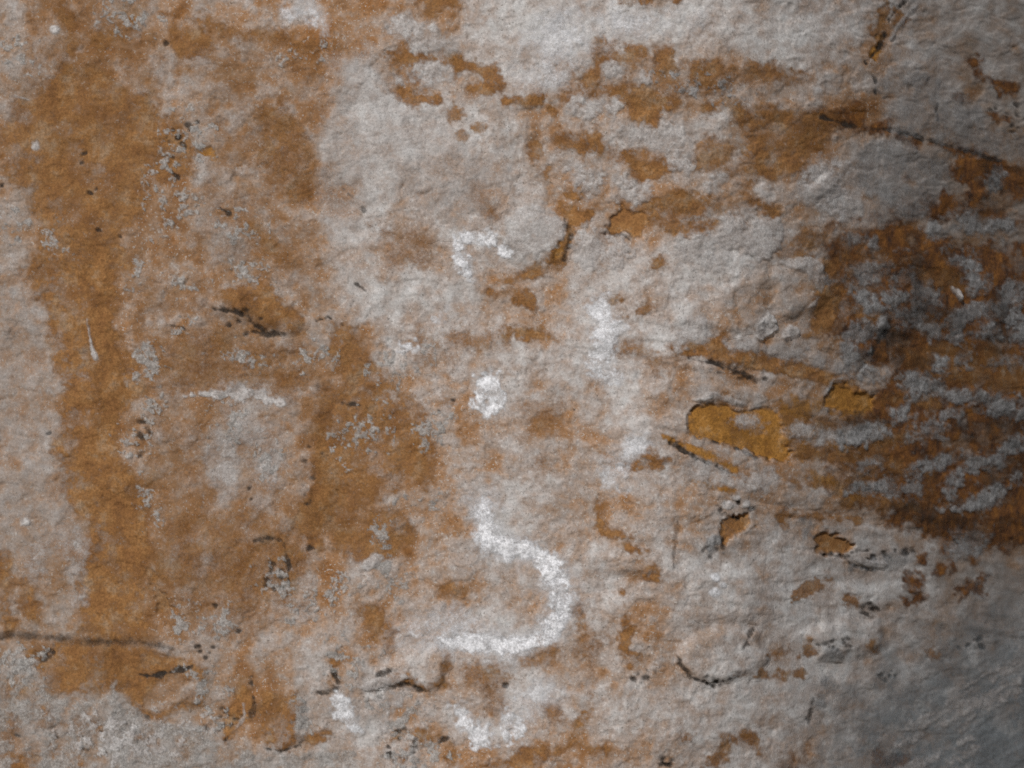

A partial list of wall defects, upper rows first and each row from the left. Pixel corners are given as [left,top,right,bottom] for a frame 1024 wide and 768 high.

corrosion [384,47,604,156]
corrosion [568,37,680,130]
crack [820,105,1001,162]
corrosion [616,149,676,185]
corrosion [628,189,722,239]
corrosion [0,0,207,719]
corrosion [662,58,1024,607]
spalling [824,378,876,417]
spalling [688,392,793,462]
spalling [707,502,755,557]
spalling [814,532,855,557]
corrosion [754,637,817,681]